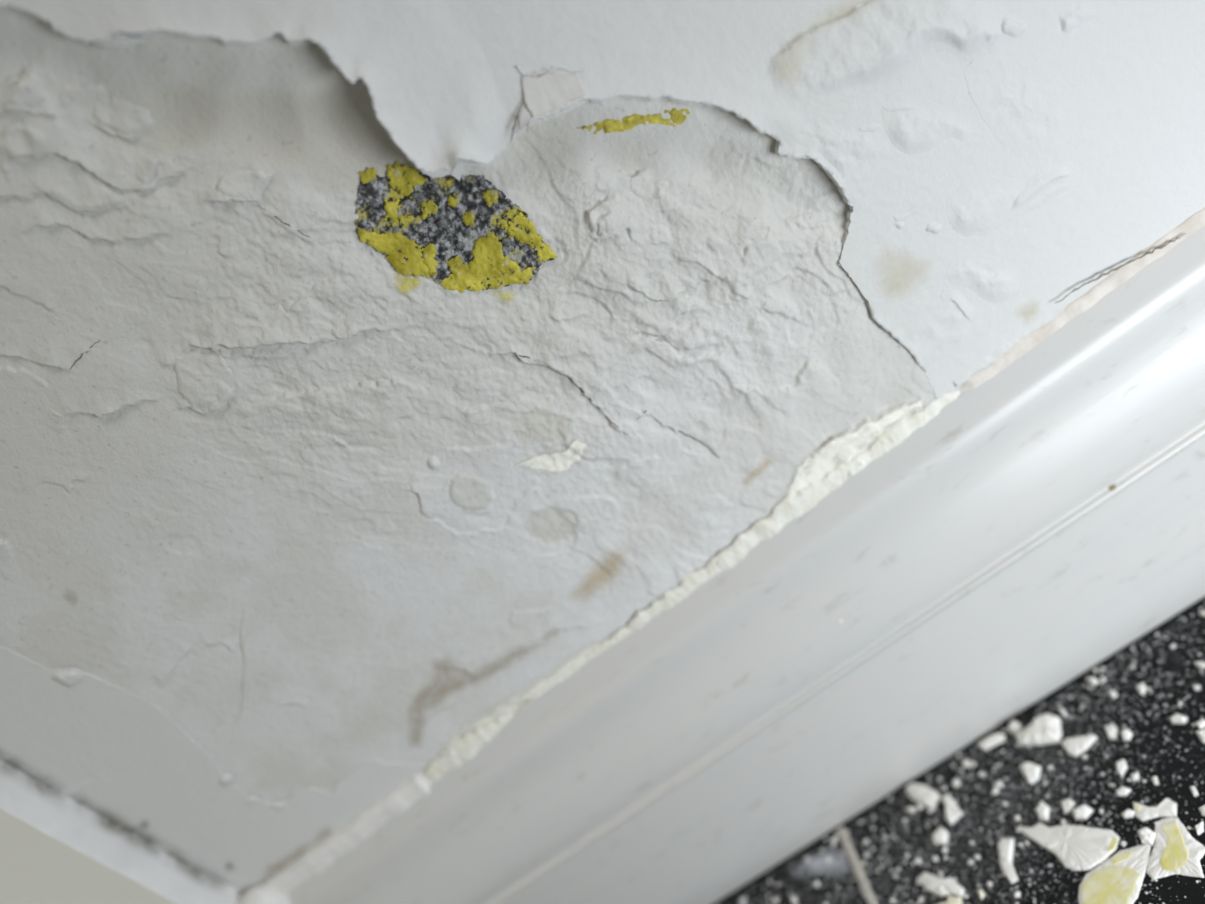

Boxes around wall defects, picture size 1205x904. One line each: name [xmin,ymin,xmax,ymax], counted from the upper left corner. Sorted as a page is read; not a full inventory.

peeling [953,207,1205,393]
flaking render [0,0,985,802]
spalling [1086,677,1118,698]
spalling [1008,707,1133,757]
spalling [1170,714,1205,744]
spalling [1020,762,1041,784]